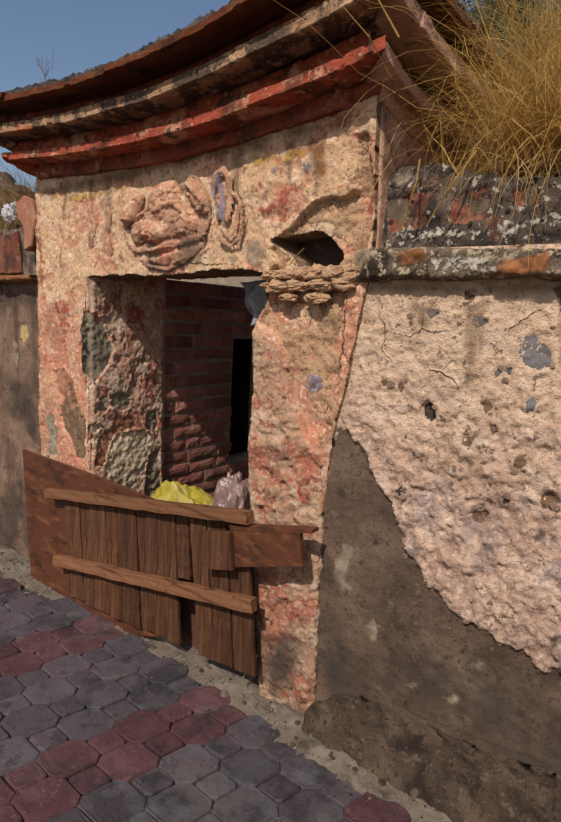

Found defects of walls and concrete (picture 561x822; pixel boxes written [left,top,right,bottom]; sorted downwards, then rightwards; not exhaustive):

spalling [284,135,375,266]
spalling [497,253,549,275]
spalling [78,310,115,381]
crack [376,312,450,363]
peeling [46,369,162,496]
peeling [263,280,561,769]